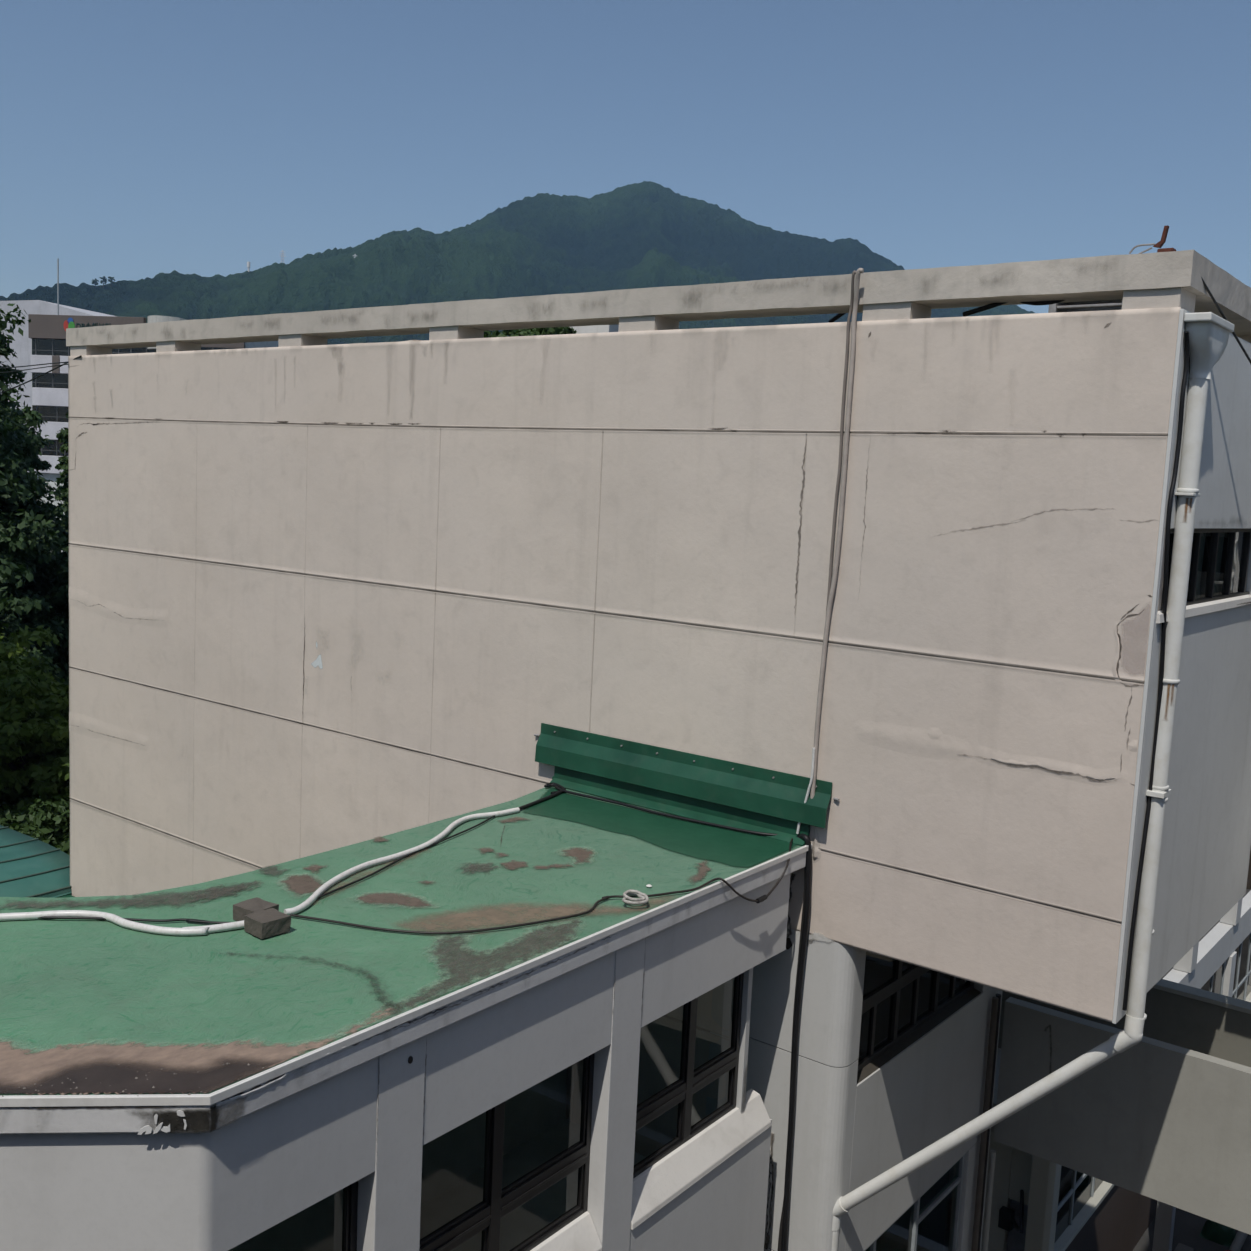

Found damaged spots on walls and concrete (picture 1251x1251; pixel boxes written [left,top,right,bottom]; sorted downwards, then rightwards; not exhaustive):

crack [795,446,806,598]
crack [964,595,1152,786]
peeling [0,919,583,1135]